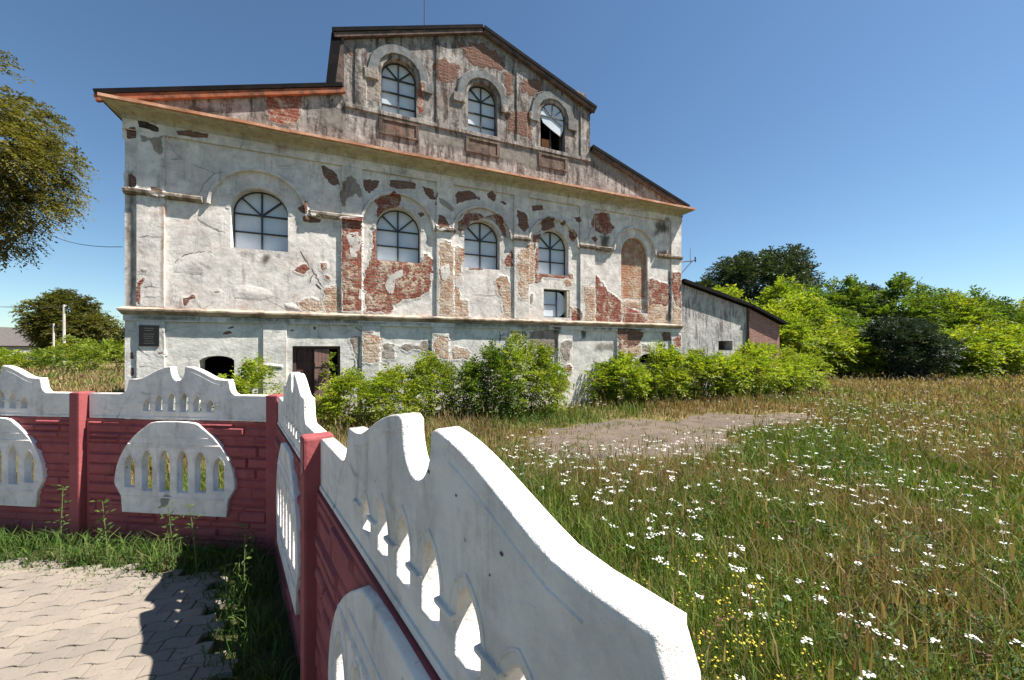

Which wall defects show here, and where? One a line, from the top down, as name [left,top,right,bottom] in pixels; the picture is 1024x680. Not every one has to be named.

flaking render [262,96,307,128]
flaking render [416,39,545,143]
flaking render [292,163,682,394]